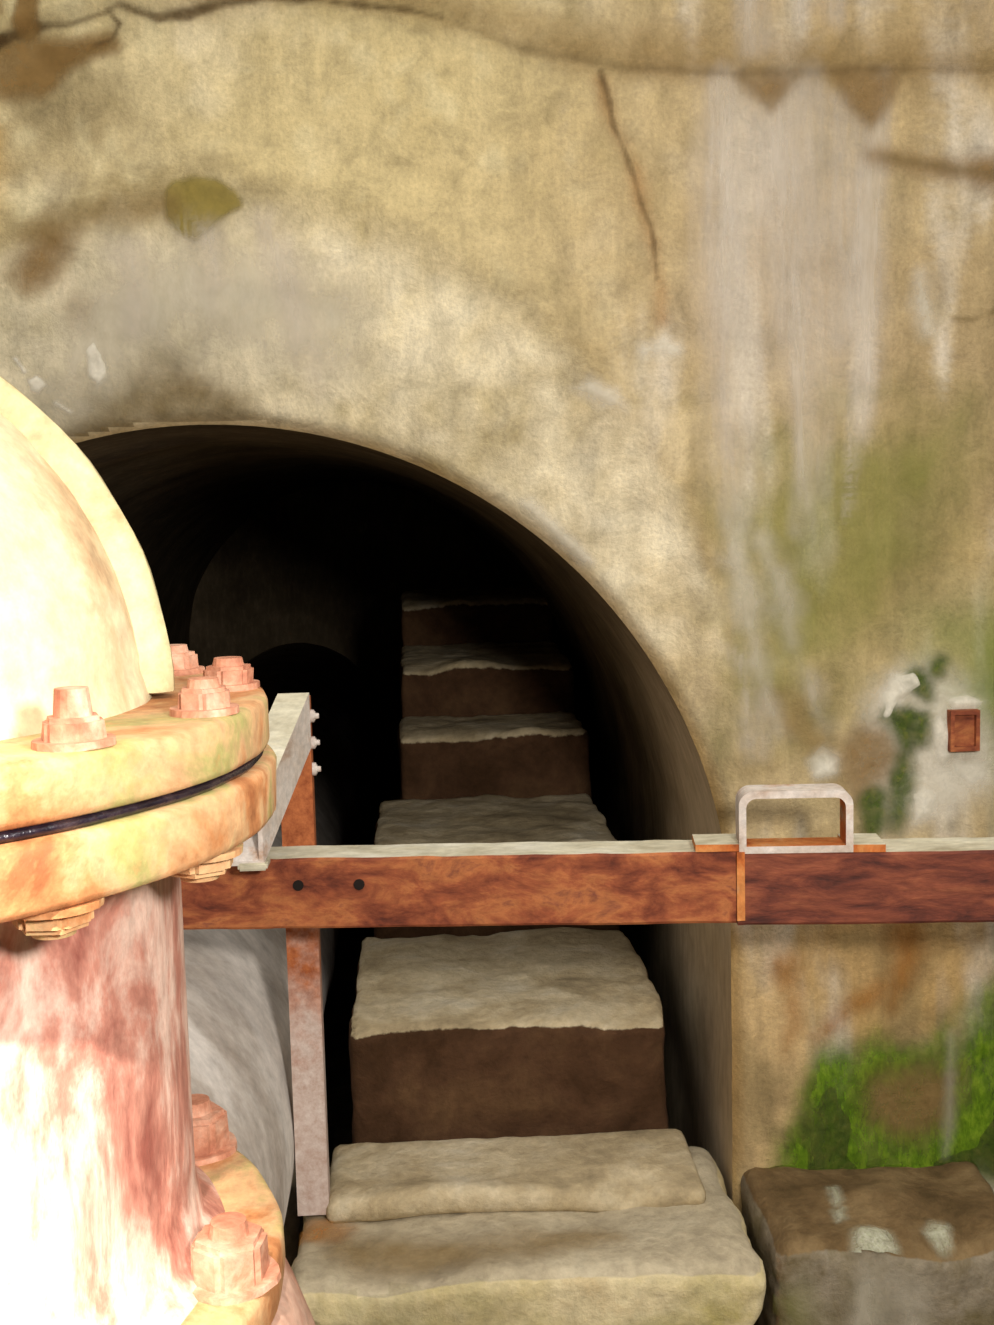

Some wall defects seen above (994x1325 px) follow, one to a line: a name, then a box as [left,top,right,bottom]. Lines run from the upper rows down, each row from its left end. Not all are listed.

water stain [0,0,115,95]
water stain [166,178,241,239]